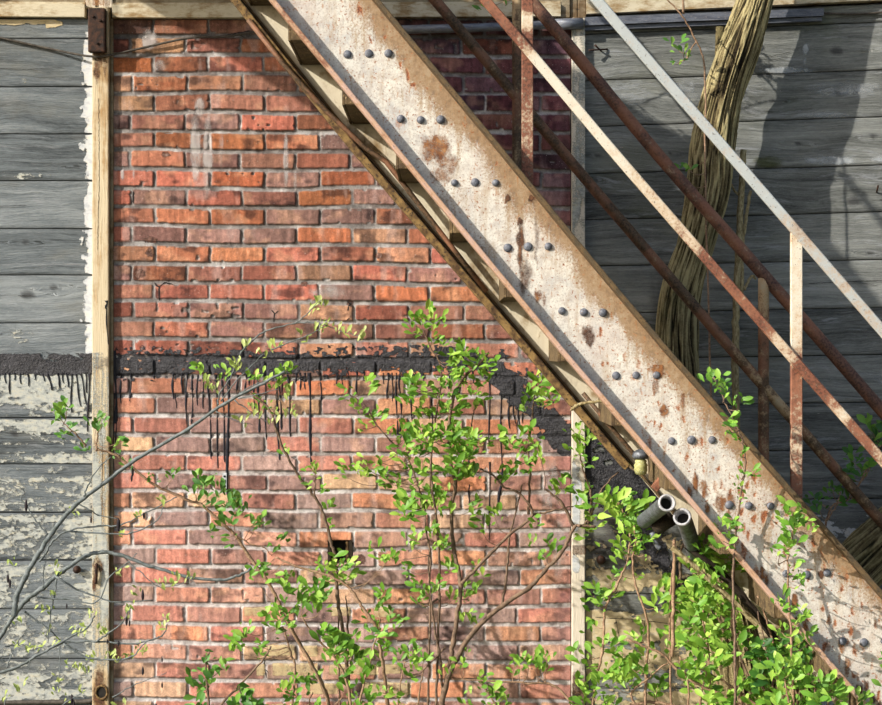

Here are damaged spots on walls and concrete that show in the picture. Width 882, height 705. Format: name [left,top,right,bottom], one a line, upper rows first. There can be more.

corrosion [423,135,457,182]
corrosion [516,217,545,305]
corrosion [582,327,595,347]
peeling [0,32,109,700]
corrosion [651,365,664,395]
corrosion [687,472,734,524]
peeling [816,515,856,538]